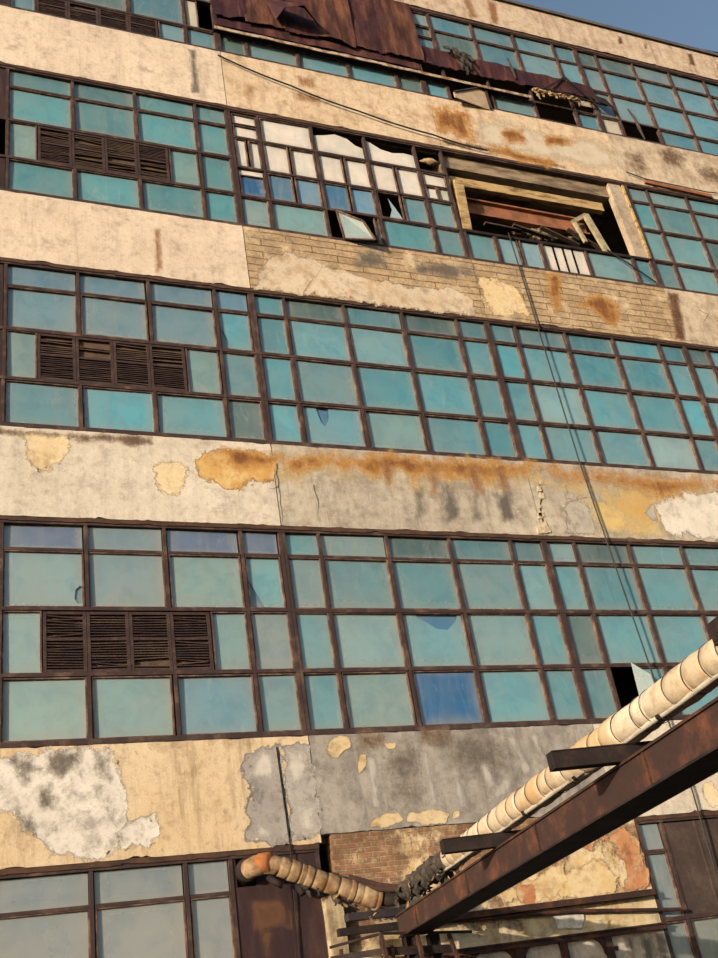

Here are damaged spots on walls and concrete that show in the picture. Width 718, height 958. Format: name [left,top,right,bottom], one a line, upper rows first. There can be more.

rust [428,105,475,141]
rust [491,128,555,168]
rust [544,136,570,146]
peeling [253,251,530,317]
rust [580,294,620,326]
peeling [152,448,279,496]
crack [271,463,283,522]
rust [276,452,718,528]
peeling [562,478,718,541]
peeling [0,744,160,863]
peeling [239,741,324,848]
flaking render [497,825,650,905]